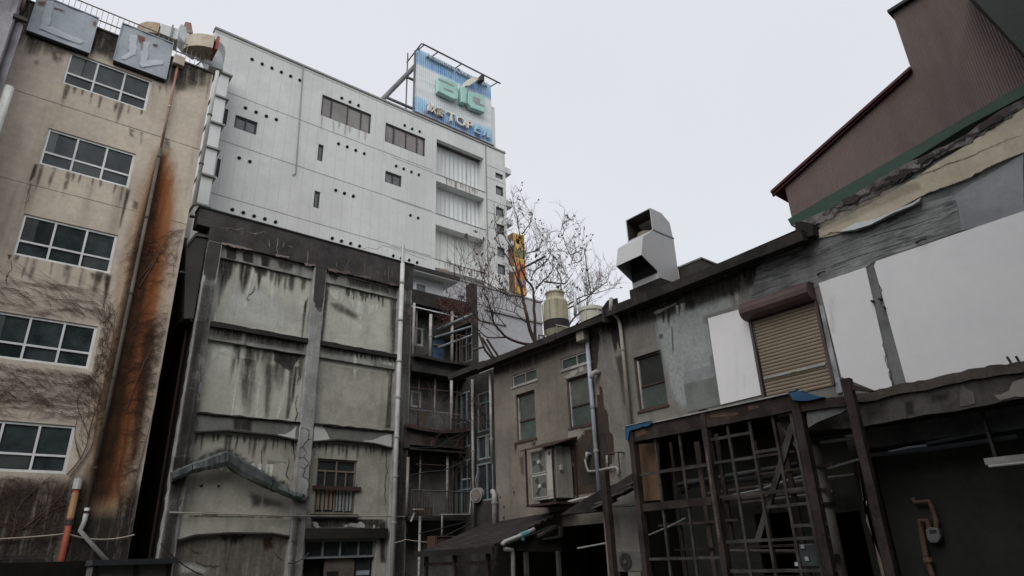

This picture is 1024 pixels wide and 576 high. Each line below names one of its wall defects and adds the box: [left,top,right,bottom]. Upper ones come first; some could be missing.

spalling [793,98,1024,226]
crack [818,103,1024,239]
rust [92,156,172,507]
water stain [203,259,308,419]
water stain [329,288,384,321]
water stain [353,352,396,377]
water stain [493,261,765,383]
water stain [195,433,294,451]
crack [261,374,315,494]